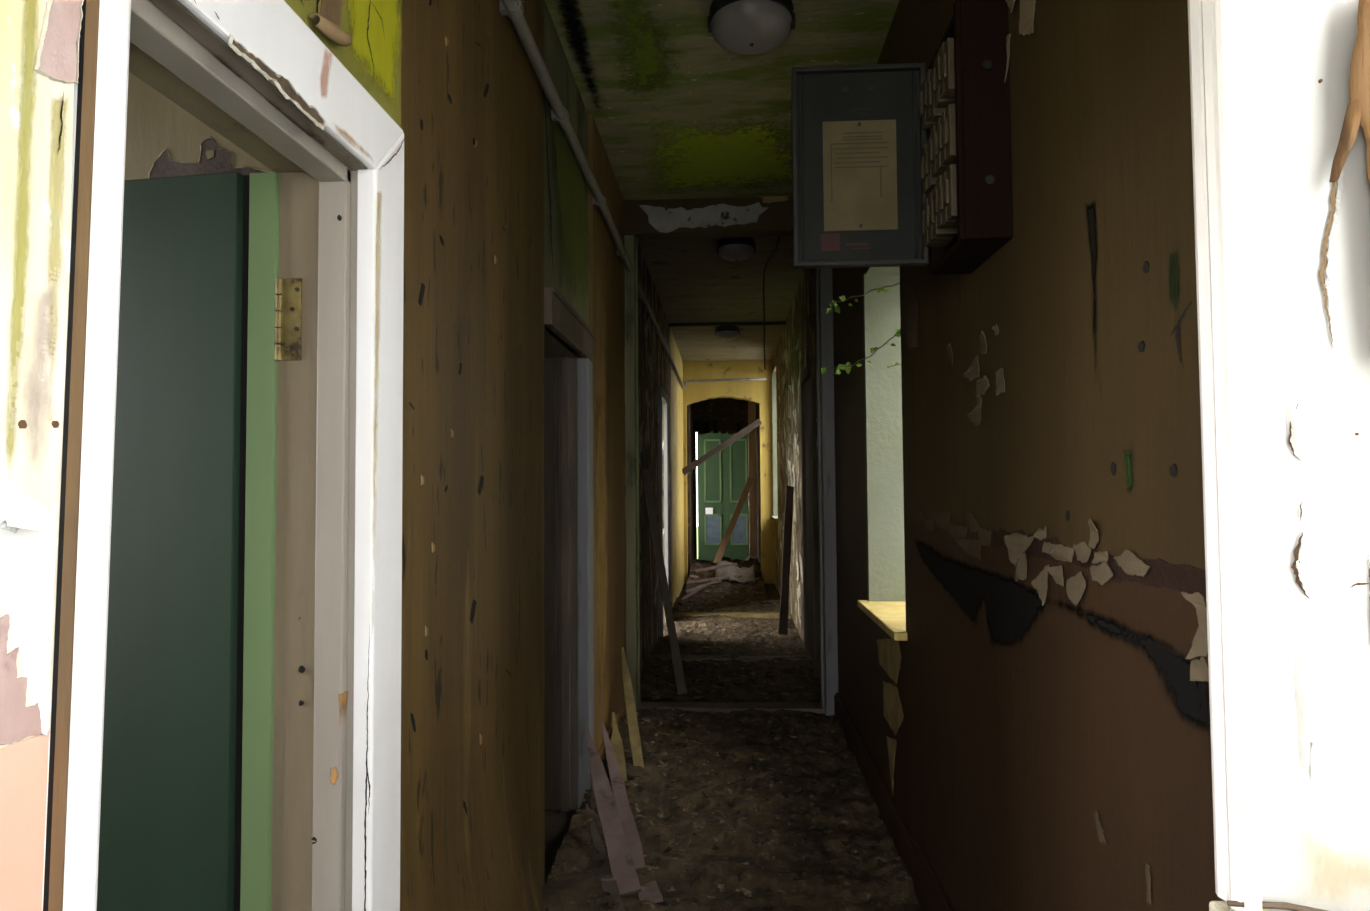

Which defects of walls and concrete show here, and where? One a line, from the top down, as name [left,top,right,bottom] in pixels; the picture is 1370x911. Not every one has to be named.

flaking render [34,0,84,84]
peeling [228,34,325,130]
mould [557,0,601,108]
peeling [1006,0,1036,36]
flaking render [148,136,270,179]
flaking render [639,196,789,233]
peeling [0,484,56,745]
peeling [993,519,1209,682]
crack [1291,532,1314,599]
crack [1350,555,1370,598]